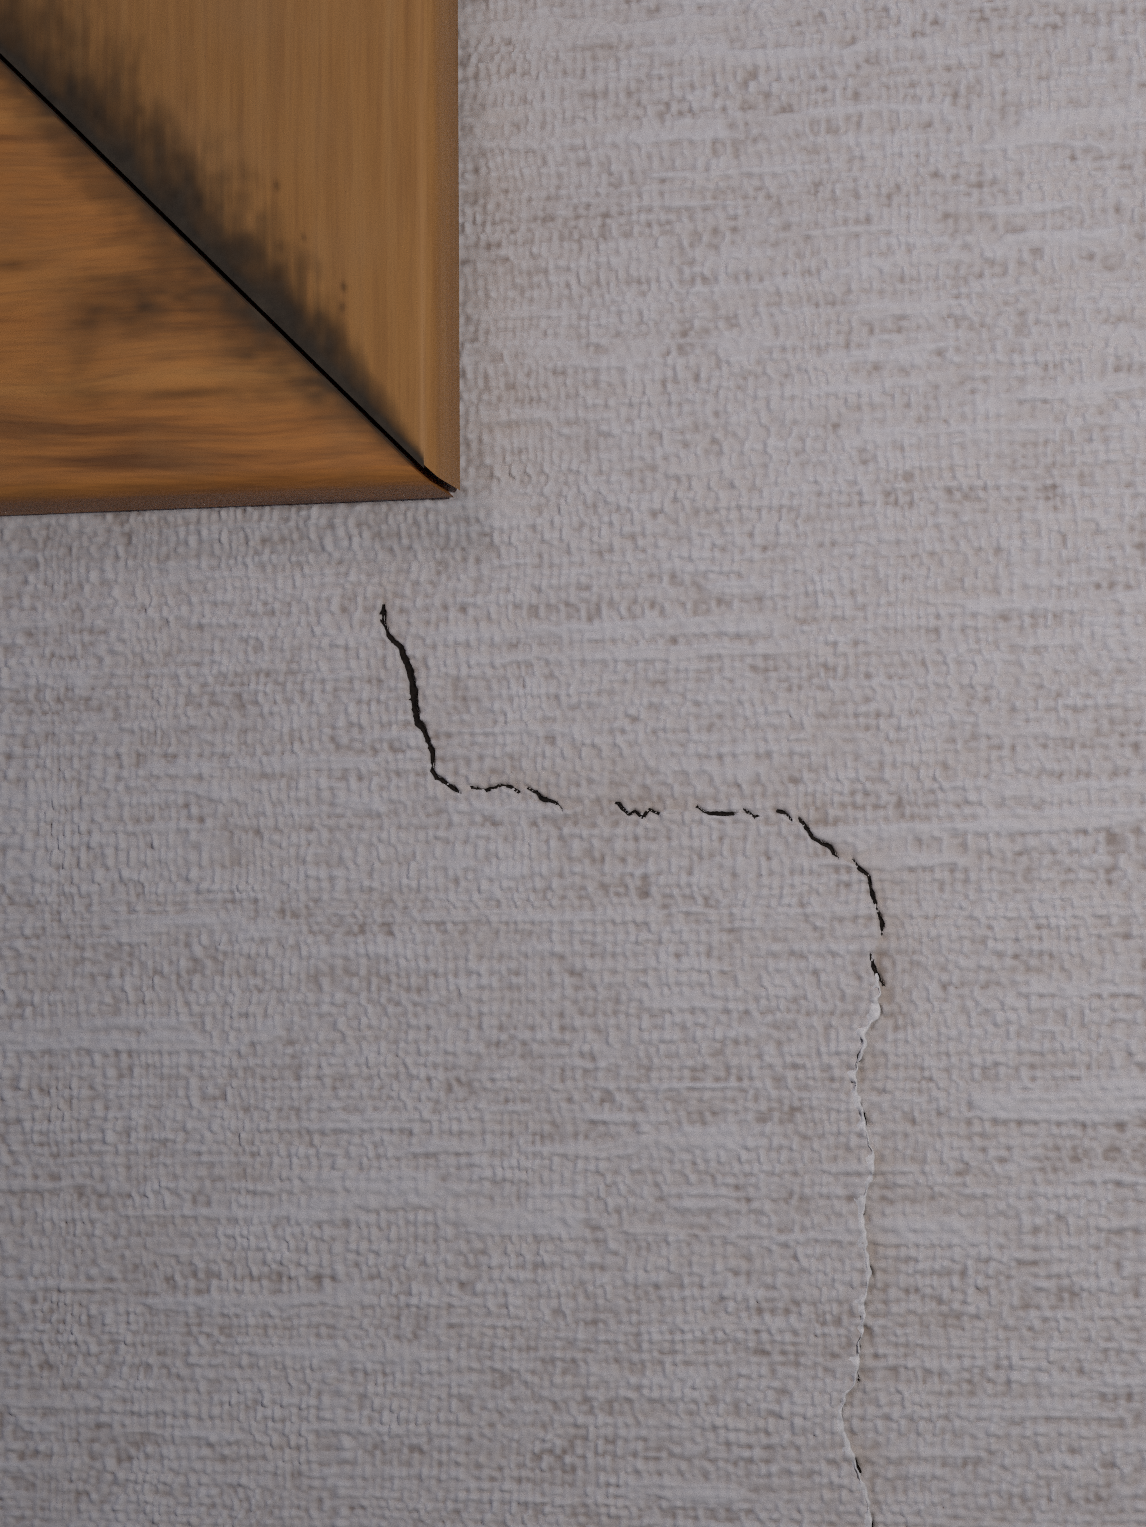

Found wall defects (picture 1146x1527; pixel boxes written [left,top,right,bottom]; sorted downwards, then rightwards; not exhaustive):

crack [379,604,562,809]
crack [615,802,660,819]
crack [696,806,884,1527]